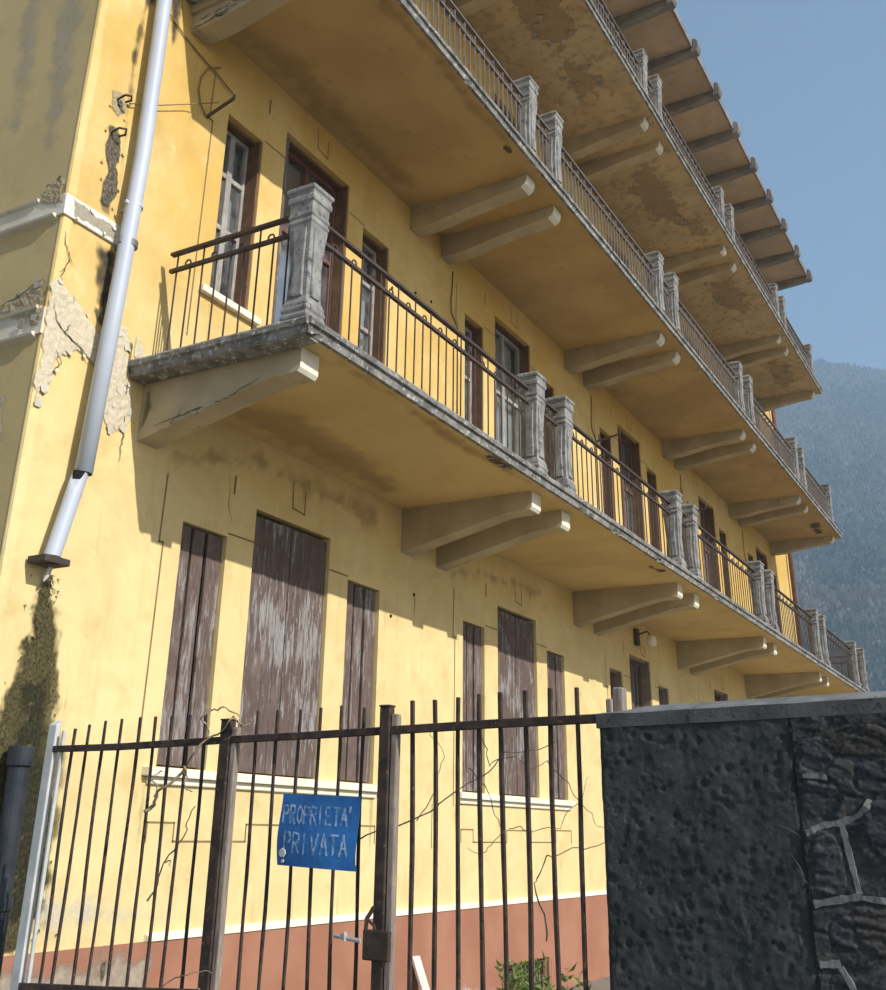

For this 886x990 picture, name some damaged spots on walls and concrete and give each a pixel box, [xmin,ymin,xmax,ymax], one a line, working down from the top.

leakage [173,0,182,41]
spalling [40,176,66,204]
spalling [74,90,131,238]
spalling [0,278,104,407]
spalling [104,326,134,461]